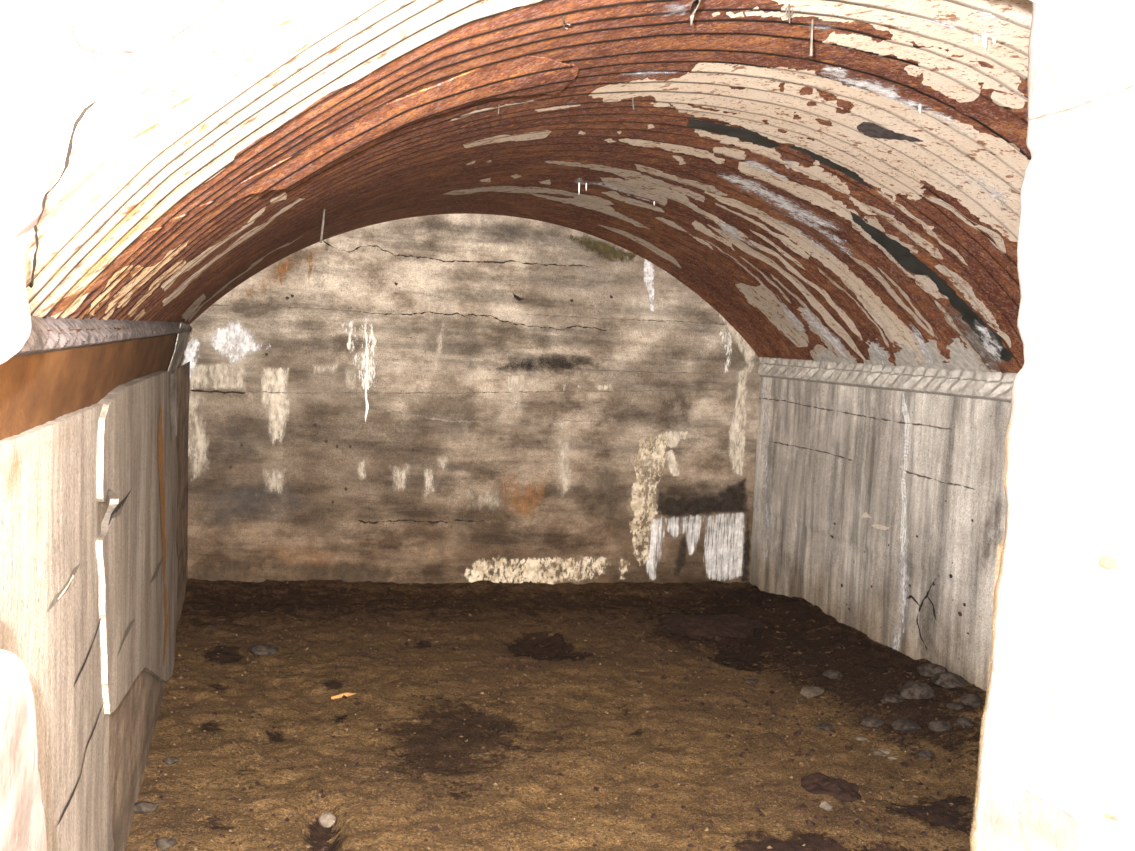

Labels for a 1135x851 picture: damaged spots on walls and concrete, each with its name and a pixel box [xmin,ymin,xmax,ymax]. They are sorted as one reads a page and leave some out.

crack [29,0,225,288]
peeling [0,0,542,321]
rust [686,86,873,189]
peeling [712,0,1032,109]
rust [950,89,1025,120]
peeling [444,62,1030,372]
rust [850,180,1014,370]
water stain [183,322,262,378]
water stain [261,368,290,441]
water stain [315,317,378,422]
water stain [615,314,755,584]
crack [906,578,937,649]